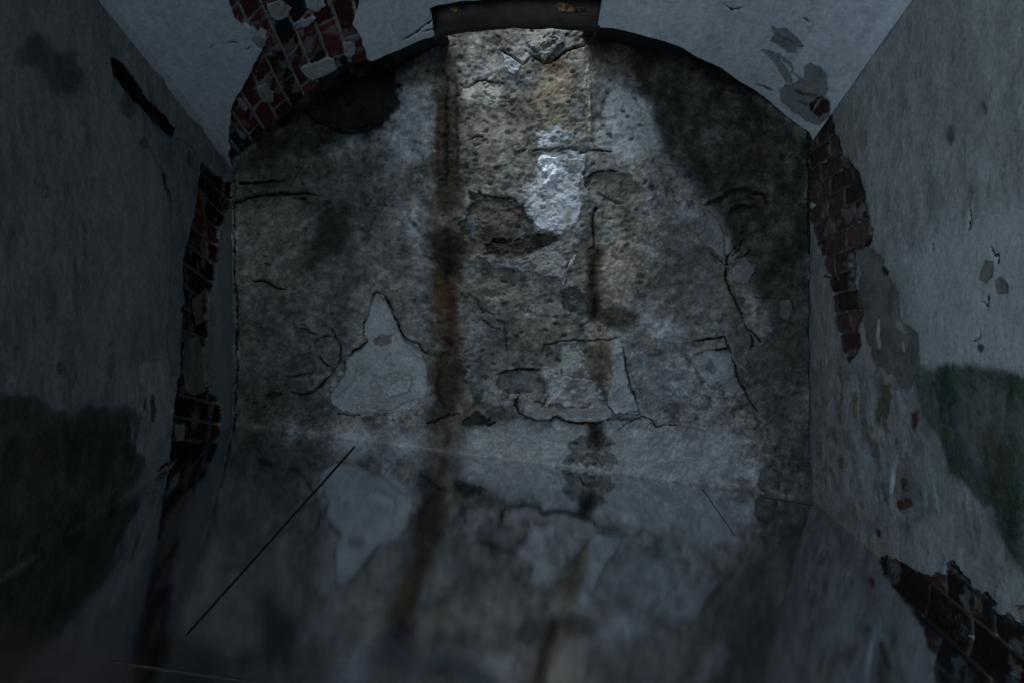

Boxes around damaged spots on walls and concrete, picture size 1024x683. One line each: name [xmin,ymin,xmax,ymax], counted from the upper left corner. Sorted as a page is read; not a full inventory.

flaking render [229,0,401,164]
crack [233,171,316,424]
crack [287,291,429,417]
flaking render [331,294,428,418]
flaking render [460,123,637,312]
crack [469,294,678,431]
crack [566,133,617,178]
corrosion [586,247,638,329]
crack [694,240,761,411]
flaking render [761,26,919,417]
corrosion [587,422,604,449]
flaking render [881,554,1024,683]